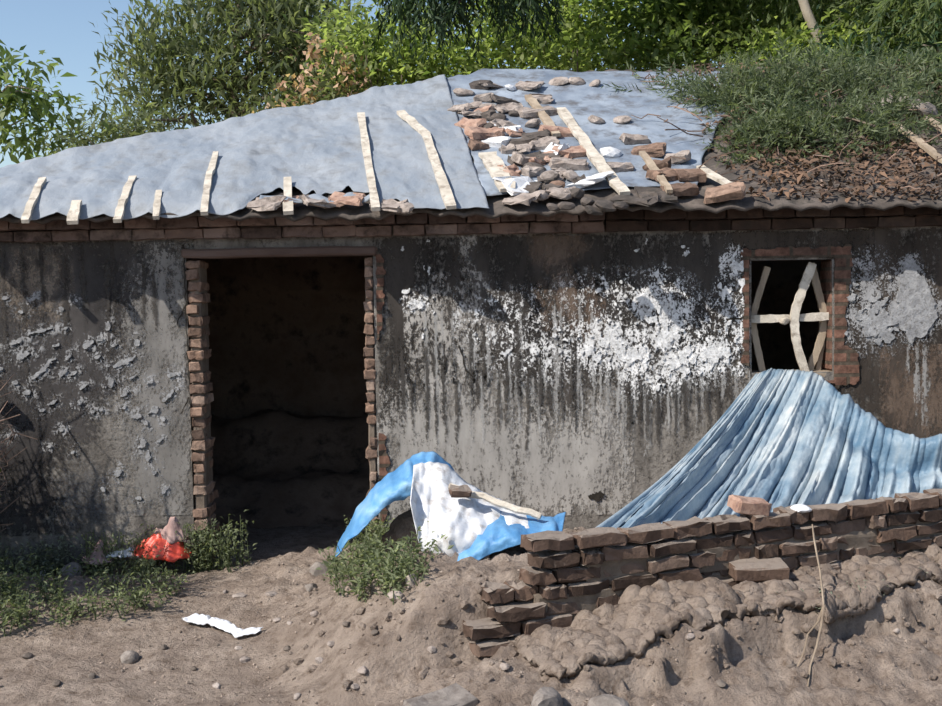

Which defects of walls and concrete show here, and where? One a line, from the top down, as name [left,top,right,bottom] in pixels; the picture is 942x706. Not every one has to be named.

peeling [0,291,185,505]
damp [0,240,194,536]
peeling [401,288,435,314]
damp [365,231,751,518]
peeling [453,244,942,402]